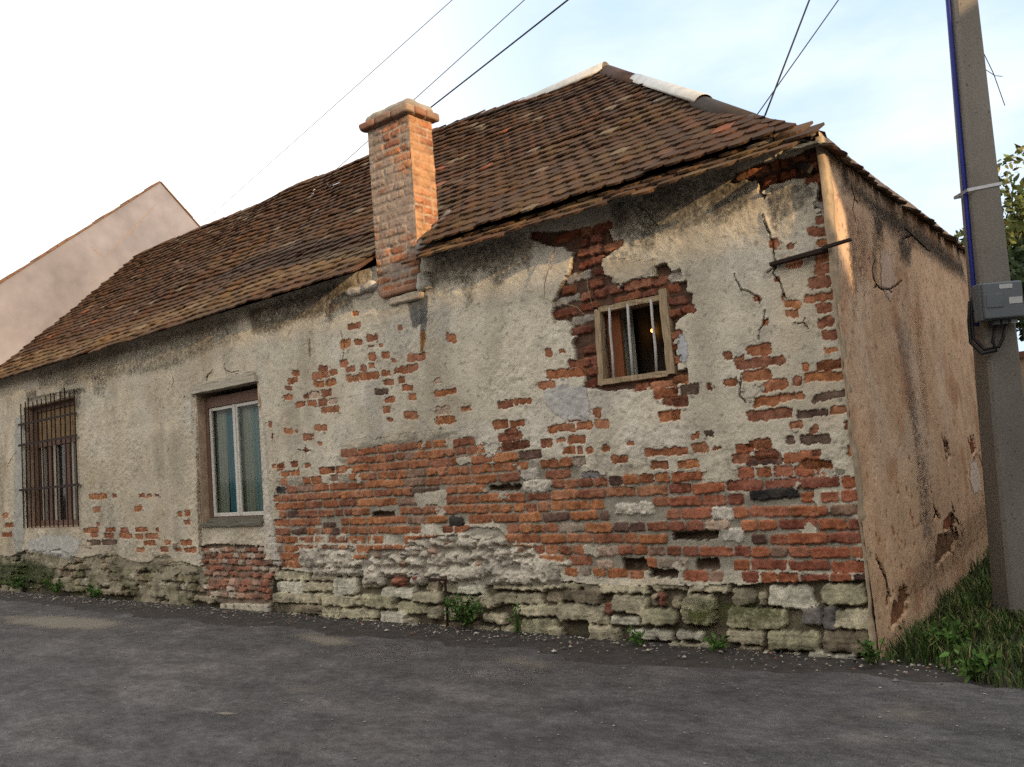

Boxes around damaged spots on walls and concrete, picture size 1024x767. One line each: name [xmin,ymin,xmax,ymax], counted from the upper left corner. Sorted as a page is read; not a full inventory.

crack [734,215,786,336]
crack [872,260,901,292]
water stain [841,170,965,278]
spalling [3,140,865,607]
spalling [934,512,961,570]
spalling [890,585,907,629]